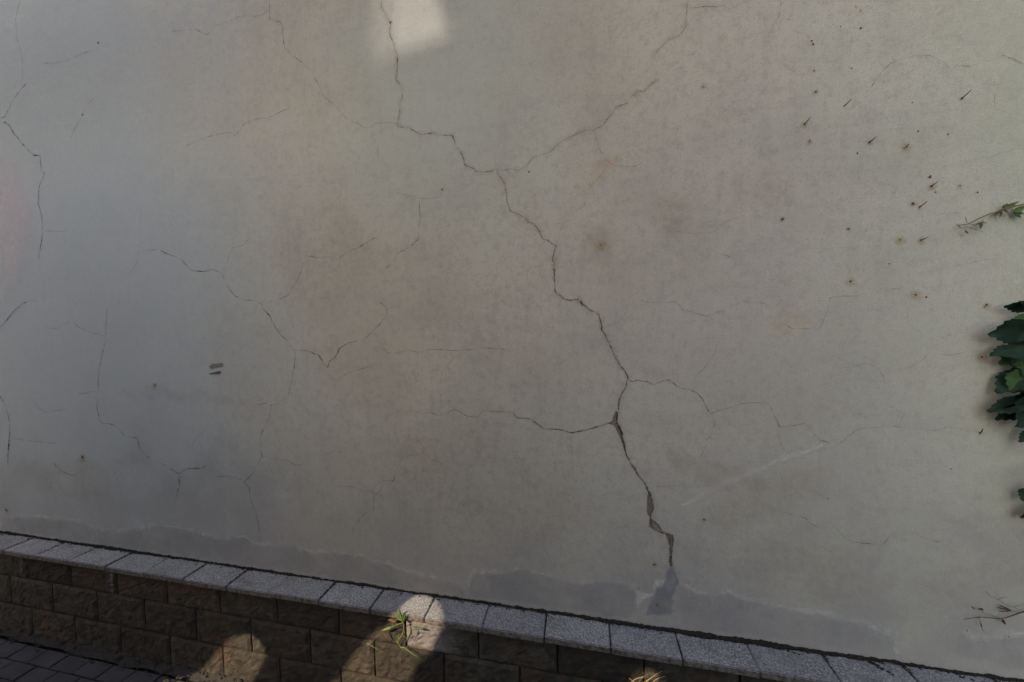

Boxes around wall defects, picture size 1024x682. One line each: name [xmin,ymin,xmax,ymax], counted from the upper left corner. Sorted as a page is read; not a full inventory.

crack [500,169,709,566]